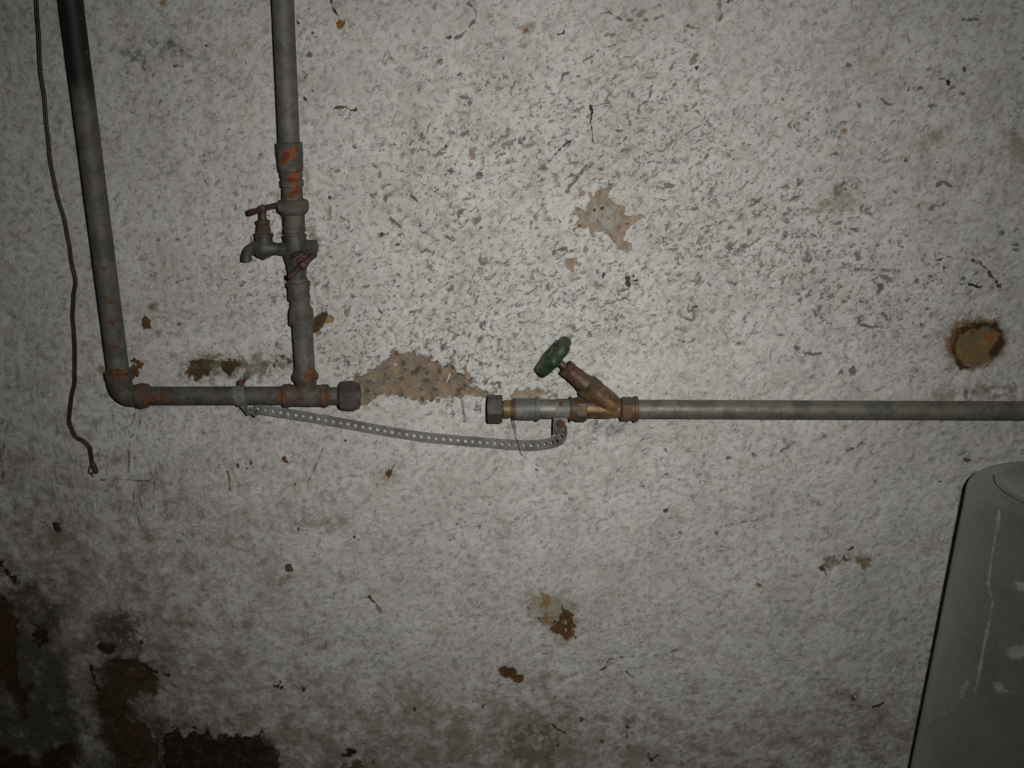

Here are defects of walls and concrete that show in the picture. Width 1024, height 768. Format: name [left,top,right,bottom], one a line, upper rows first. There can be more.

peeling [552,186,645,272]
spalling [179,354,293,382]
spalling [353,351,557,411]
corrosion [947,319,1006,370]
water stain [0,560,55,648]
corrosion [527,593,577,641]
water stain [0,742,80,768]